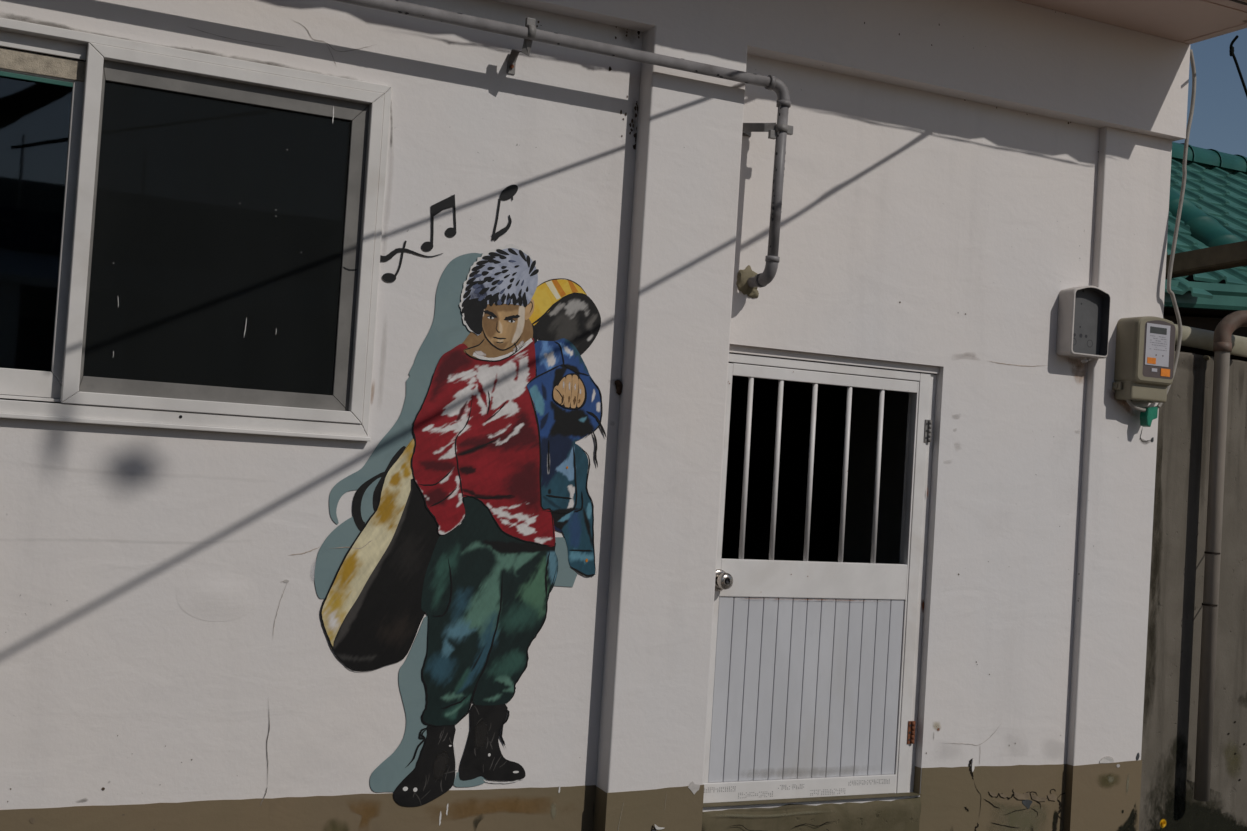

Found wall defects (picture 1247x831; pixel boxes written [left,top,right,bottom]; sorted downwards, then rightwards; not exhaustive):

crack [187,20,376,67]
leakage [1153,446,1162,589]
leakage [1145,625,1155,712]
flaking render [985,789,1065,831]
leakage [1118,805,1136,831]
leakage [1150,737,1247,831]